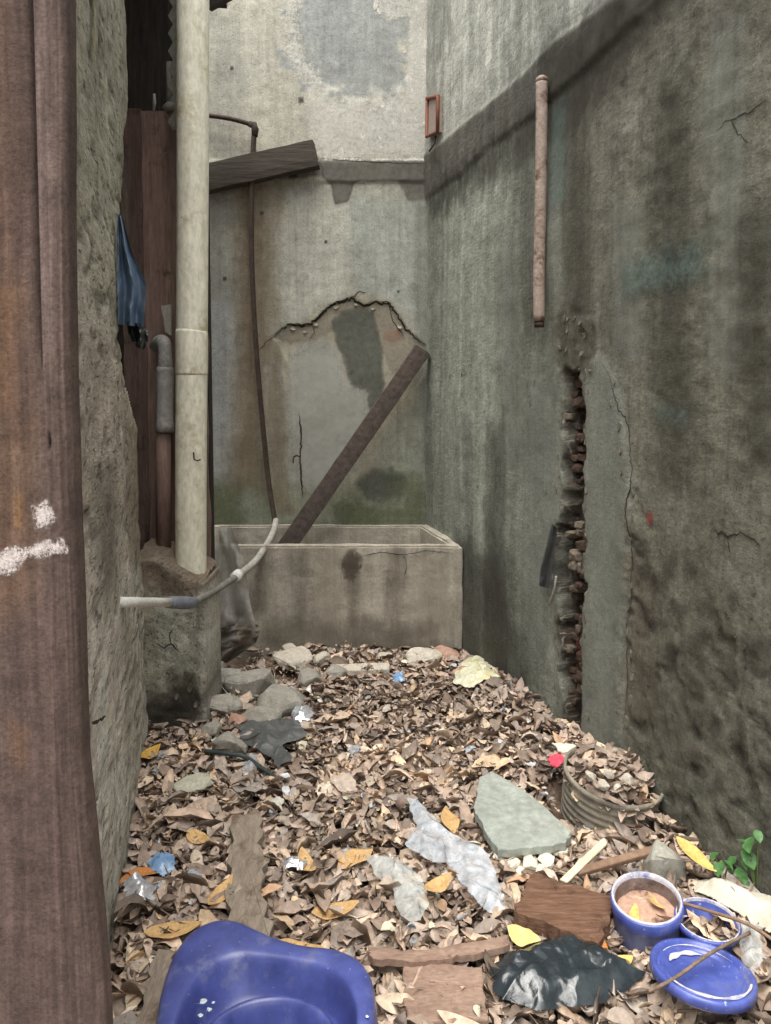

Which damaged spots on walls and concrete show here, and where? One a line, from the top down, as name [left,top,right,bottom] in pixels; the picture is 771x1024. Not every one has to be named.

crack [715,99,769,142]
flaking render [280,303,420,371]
water stain [333,308,385,409]
crack [292,415,303,495]
peeling [558,346,634,729]
crack [712,529,761,551]